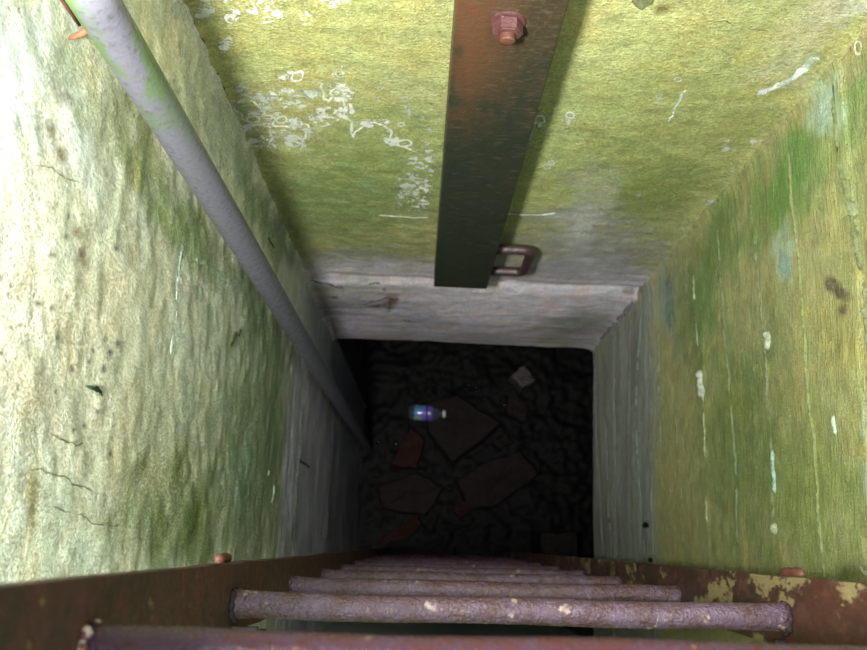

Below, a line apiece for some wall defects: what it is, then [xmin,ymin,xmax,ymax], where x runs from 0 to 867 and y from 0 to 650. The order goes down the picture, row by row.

peeling [194,0,287,24]
peeling [217,36,235,51]
peeling [232,65,438,211]
crack [29,468,104,496]
crack [49,506,119,527]